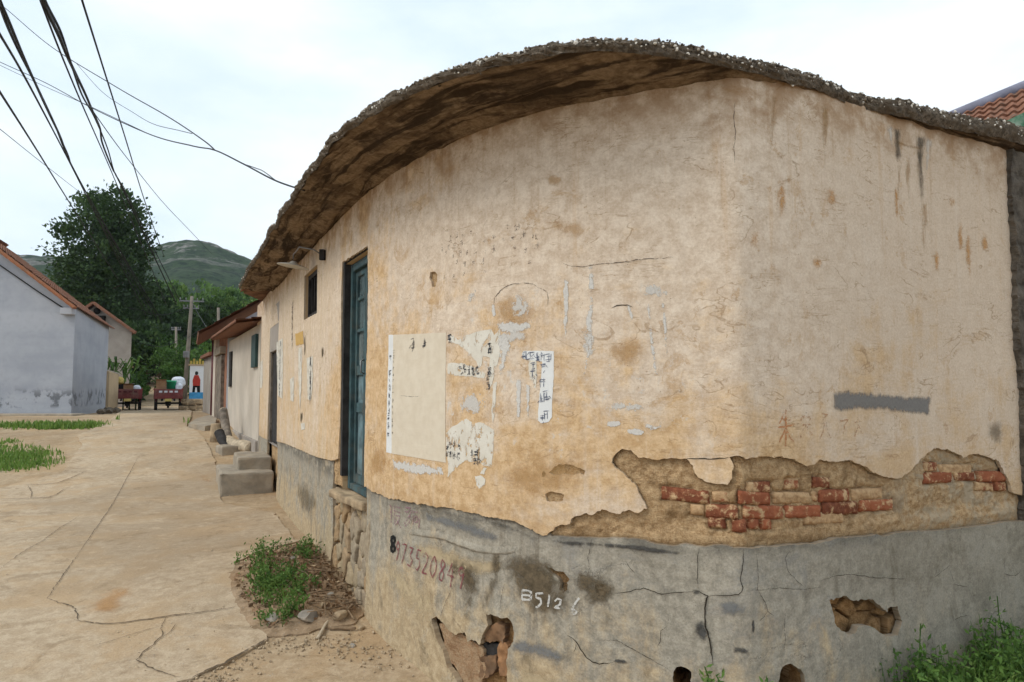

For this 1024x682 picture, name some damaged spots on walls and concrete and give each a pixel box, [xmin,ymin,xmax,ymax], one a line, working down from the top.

damp [918,138,931,175]
crack [6,463,135,564]
flaking render [550,448,1018,547]
crack [48,598,269,677]
crack [567,549,897,670]